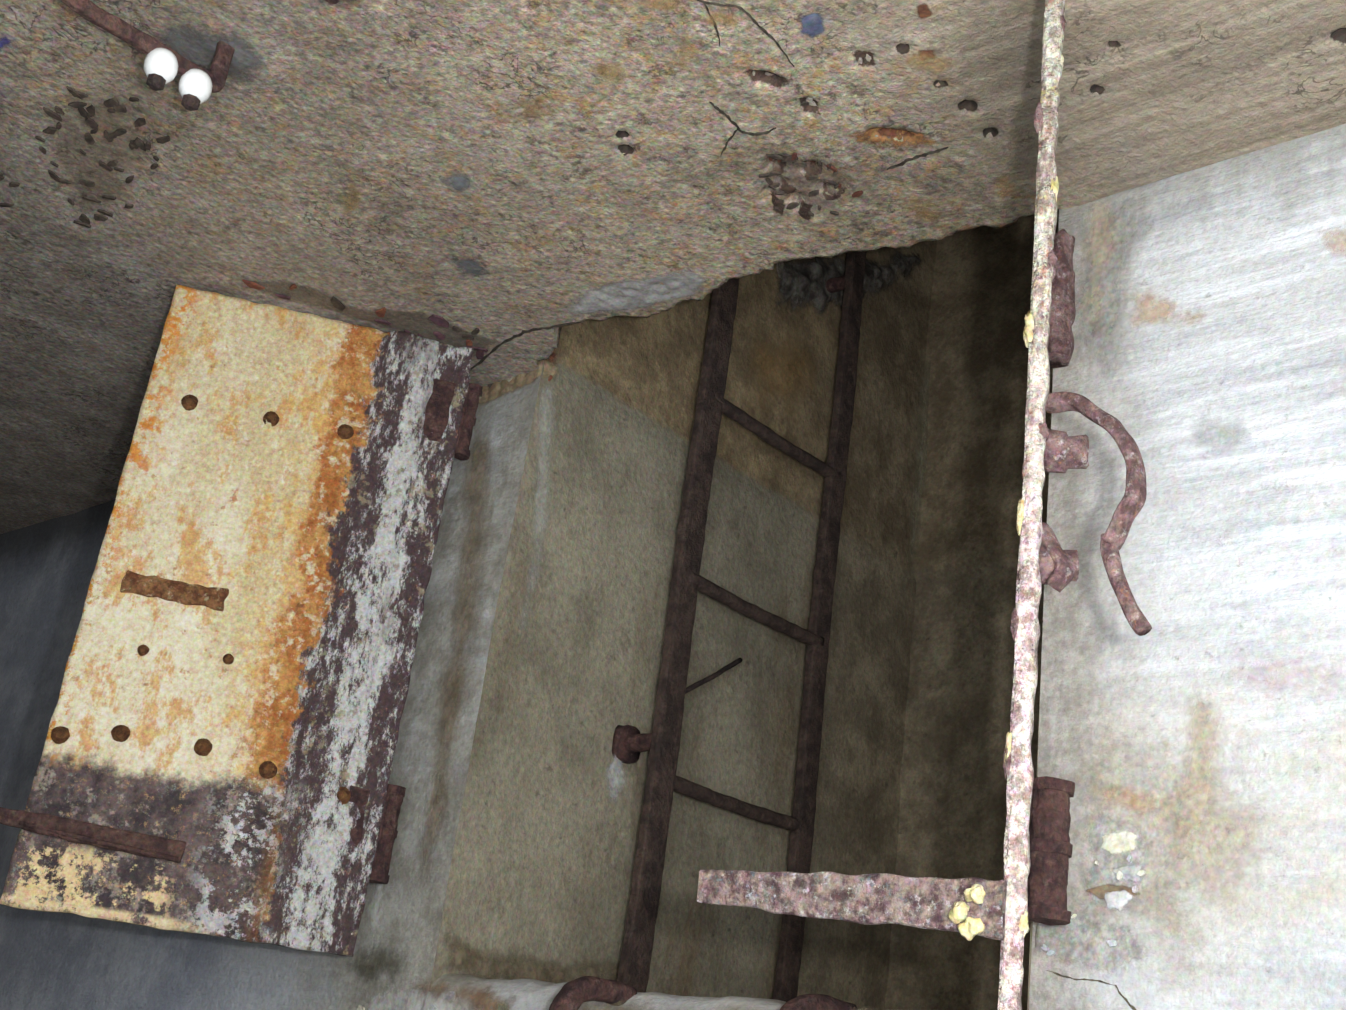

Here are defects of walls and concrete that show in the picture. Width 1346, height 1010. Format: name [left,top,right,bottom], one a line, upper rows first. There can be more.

crack [697,0,794,67]
peeling [35,86,170,228]
spalling [759,153,863,221]
rust [855,127,933,148]
spalling [776,257,846,313]
crack [470,321,584,371]
peeling [1035,816,1147,970]
crack [1046,970,1136,1010]